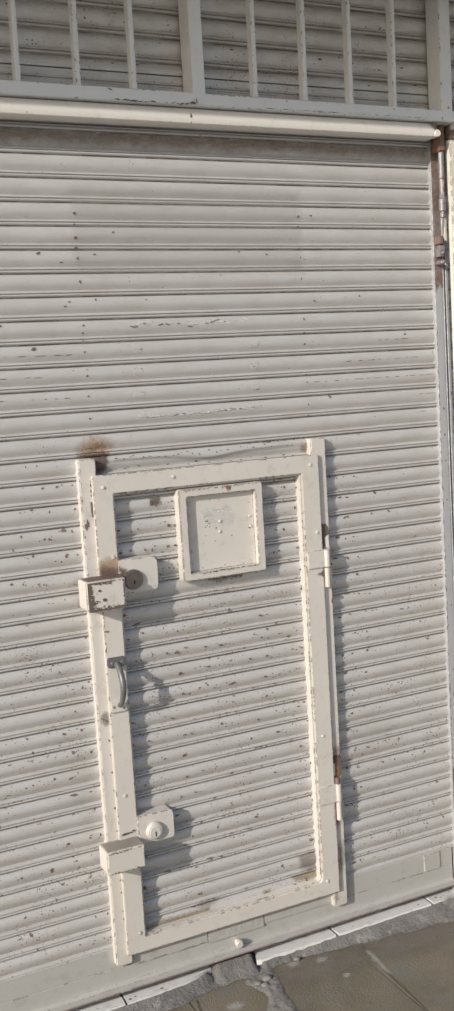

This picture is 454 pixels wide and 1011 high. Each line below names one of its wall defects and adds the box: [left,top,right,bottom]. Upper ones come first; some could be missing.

corrosion [430,123,443,292]
corrosion [77,439,107,473]
peeling [321,523,359,559]
corrosion [81,560,127,582]
peeling [87,574,144,653]
corrosion [333,750,342,778]